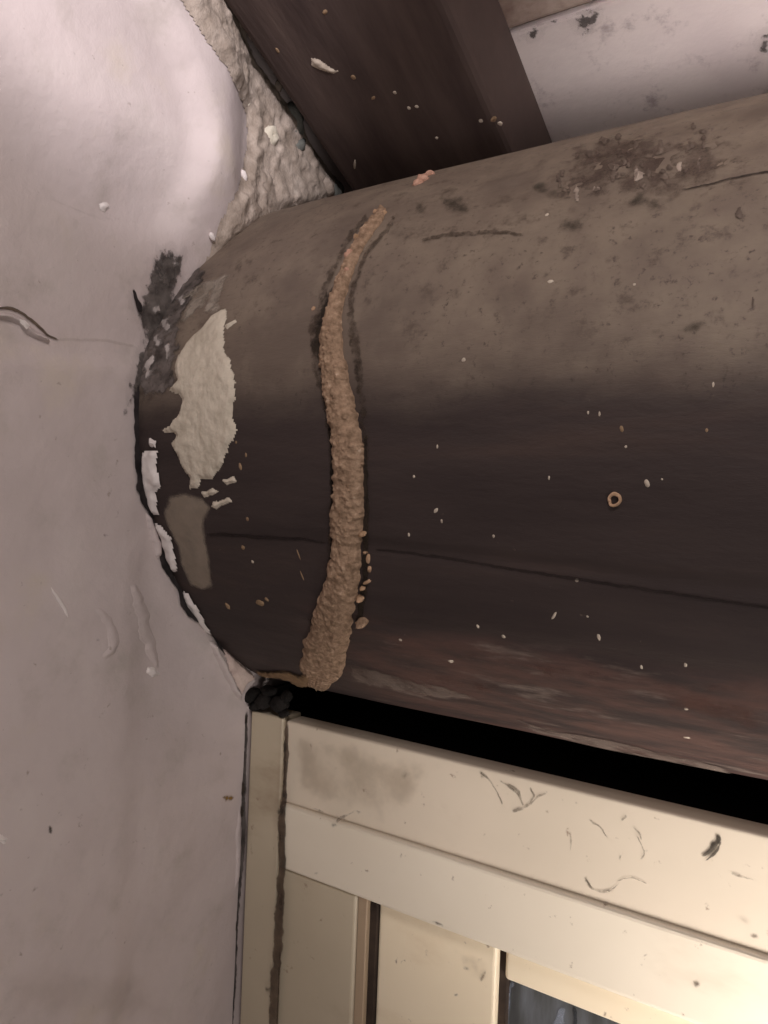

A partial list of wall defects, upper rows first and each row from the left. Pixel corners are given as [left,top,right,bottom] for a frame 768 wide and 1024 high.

peeling [556,122,720,202]
crack [684,171,768,190]
leakage [129,250,205,402]
flaking render [201,476,237,508]
crack [207,533,323,543]
crack [377,549,768,609]